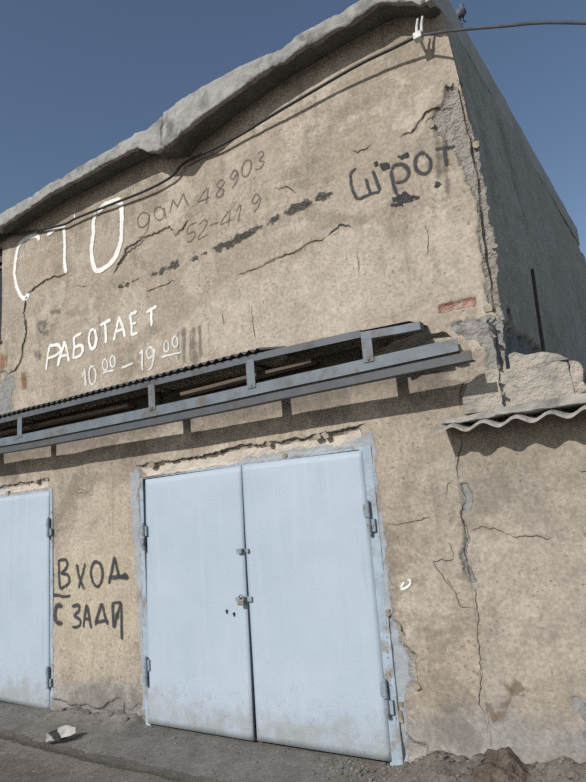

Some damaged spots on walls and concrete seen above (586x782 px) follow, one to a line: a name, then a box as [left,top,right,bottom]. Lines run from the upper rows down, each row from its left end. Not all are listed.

crack [401,107,455,136]
crack [112,220,188,277]
crack [238,223,353,275]
spalling [429,80,538,407]
crack [10,273,86,373]
crack [136,423,364,466]
spalling [459,482,476,584]
crack [433,438,549,724]
spalling [385,609,428,757]